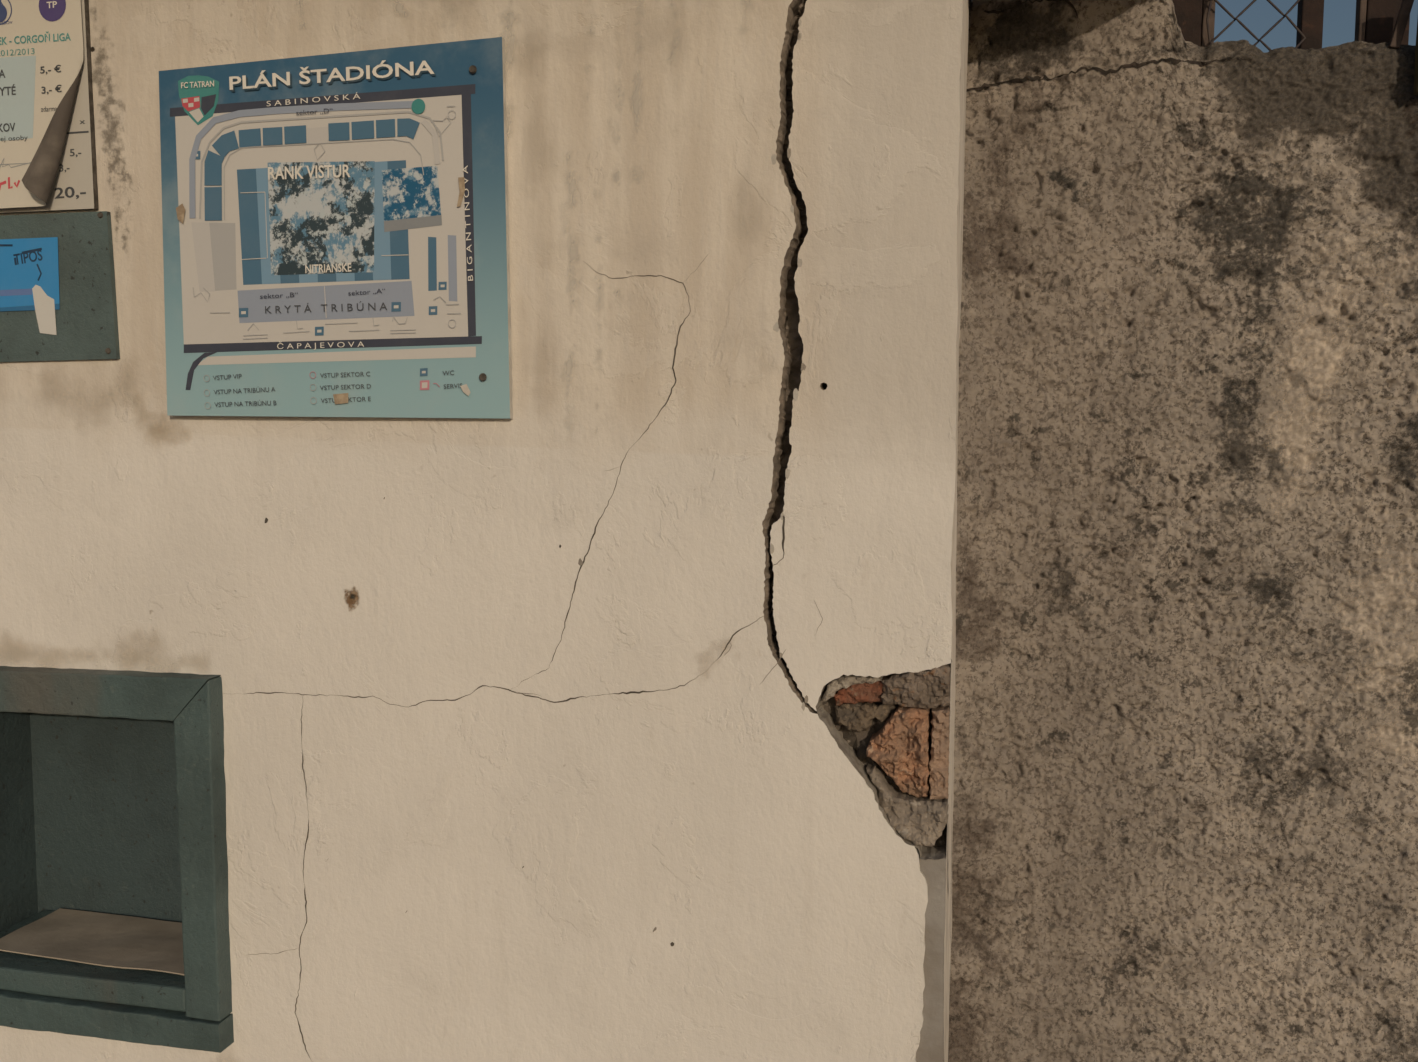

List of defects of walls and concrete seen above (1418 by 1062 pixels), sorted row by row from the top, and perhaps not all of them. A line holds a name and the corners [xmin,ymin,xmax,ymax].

leakage [978,0,1083,82]
crack [984,0,1078,28]
crack [966,56,1250,92]
leakage [1050,171,1096,212]
leakage [1180,39,1418,514]
crack [235,0,821,1061]
leakage [1248,562,1301,631]
leakage [1342,550,1418,763]
flaking render [816,659,952,1062]